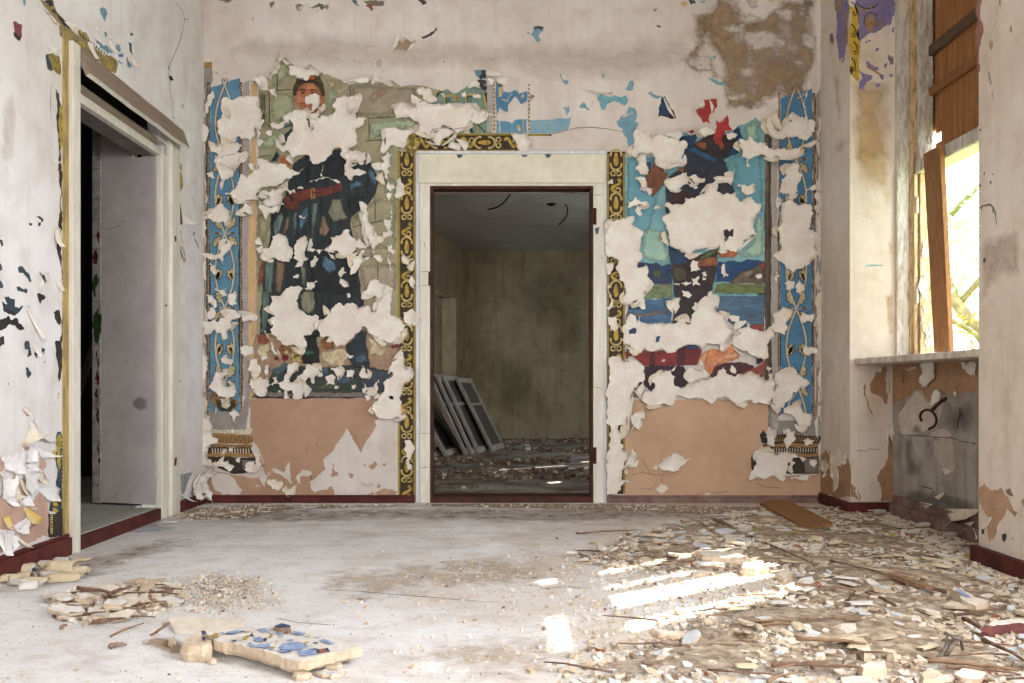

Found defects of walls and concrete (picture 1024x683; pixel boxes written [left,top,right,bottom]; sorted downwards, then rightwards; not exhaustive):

peeling [13,21,23,41]
peeling [527,26,544,43]
leakage [686,0,815,109]
peeling [830,0,895,90]
peeling [510,132,532,157]
peeling [0,86,66,399]
peeling [180,51,524,503]
peeling [550,77,861,501]
peeling [858,273,979,502]
peeling [0,407,63,556]
peeling [921,484,1024,542]